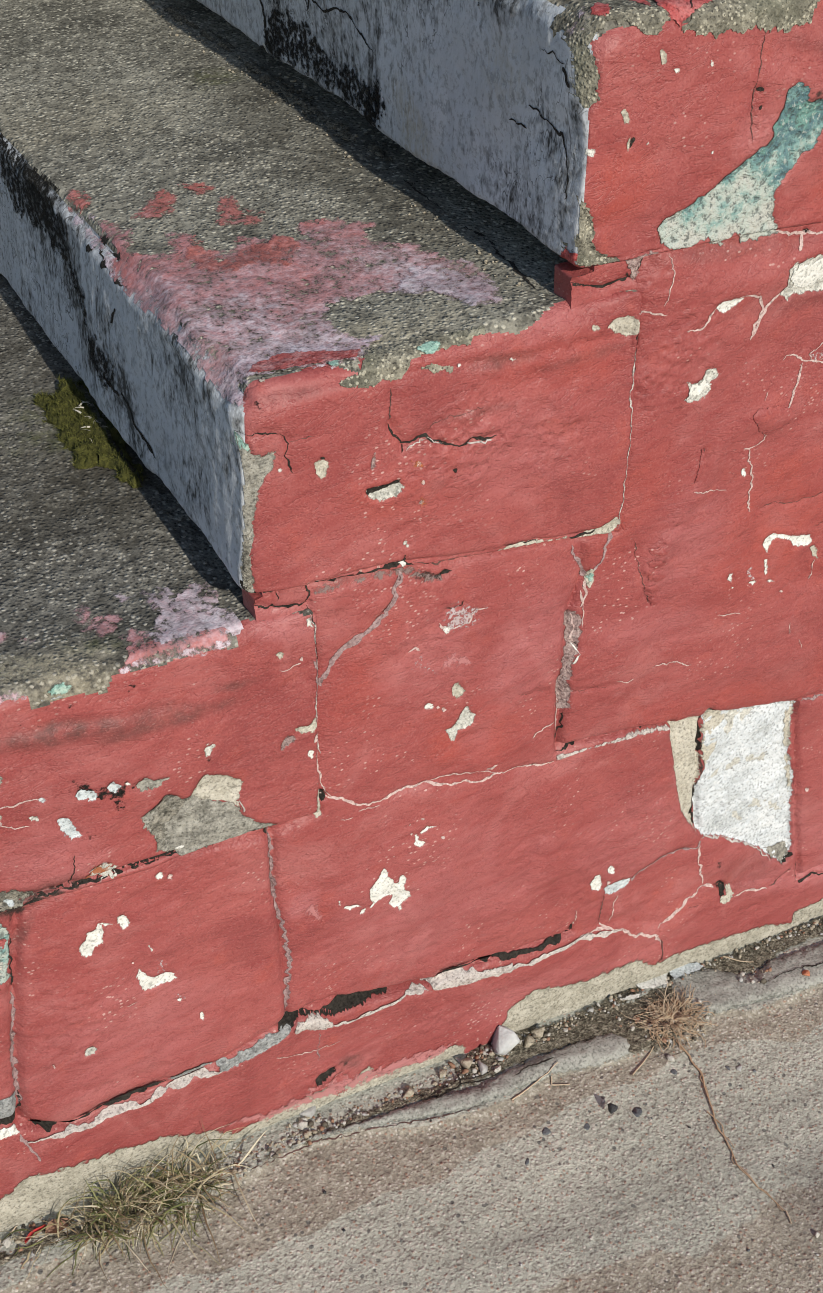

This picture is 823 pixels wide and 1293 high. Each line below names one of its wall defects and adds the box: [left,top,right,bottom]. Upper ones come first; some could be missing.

spalling [561,82,823,280]
peeling [65,182,502,407]
crack [388,388,496,452]
crack [240,541,467,696]
crack [320,530,689,820]
crack [0,798,45,830]
spalling [72,774,277,856]
peeling [339,869,410,914]
flaking render [667,694,823,863]
crack [0,827,823,1143]
peeling [0,1044,465,1231]
crack [251,1057,554,1170]